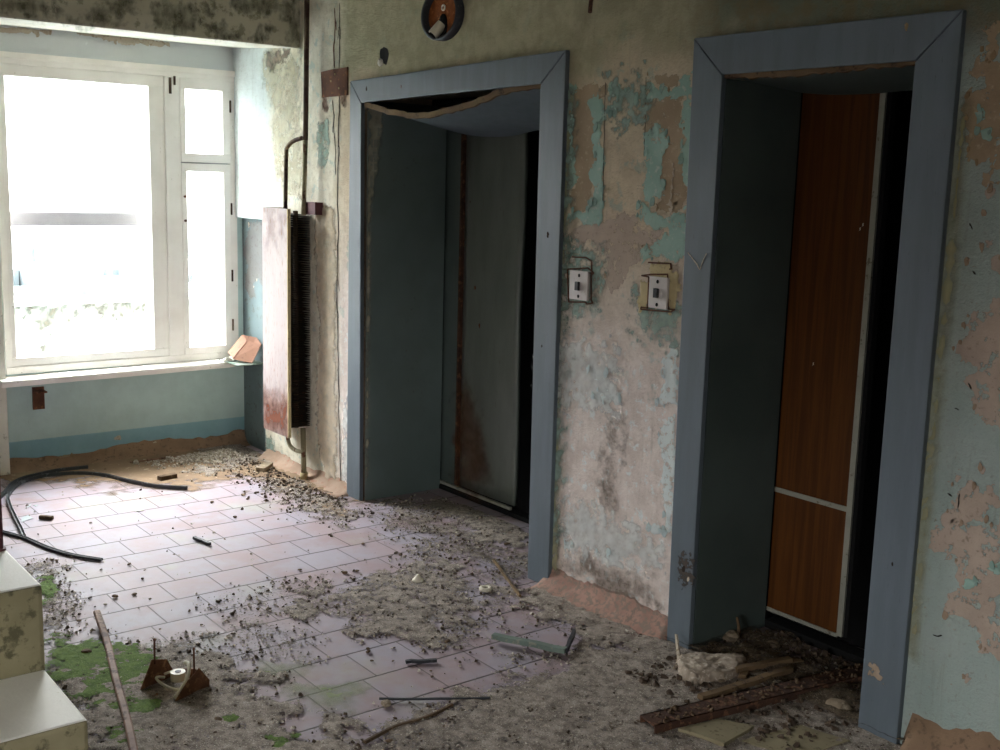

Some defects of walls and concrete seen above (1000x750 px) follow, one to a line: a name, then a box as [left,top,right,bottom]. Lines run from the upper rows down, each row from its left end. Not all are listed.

water stain [154,3,239,39]
water stain [231,0,297,42]
spalling [566,60,693,265]
rust [454,134,476,485]
water stain [580,555,659,607]
peeling [928,462,1000,661]